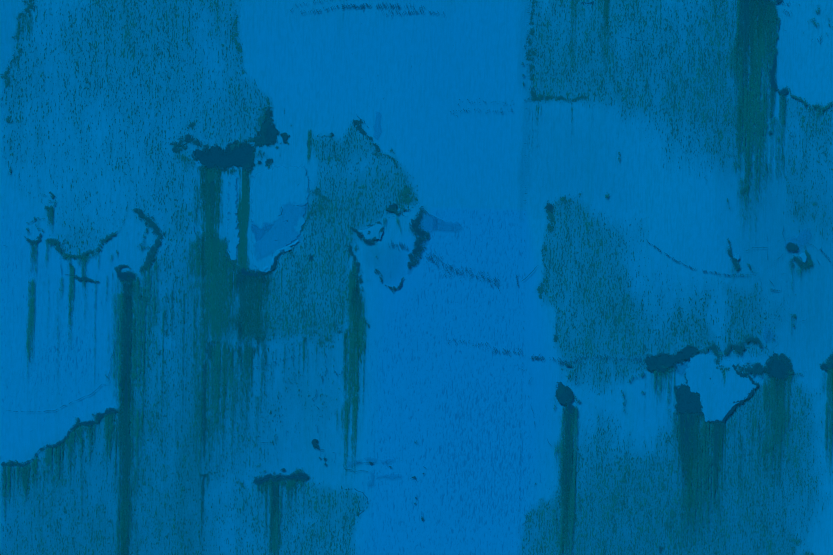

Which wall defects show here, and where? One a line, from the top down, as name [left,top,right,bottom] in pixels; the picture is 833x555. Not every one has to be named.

peeling [170,107,335,275]
peeling [352,116,398,165]
peeling [350,203,443,268]
peeling [643,336,801,470]